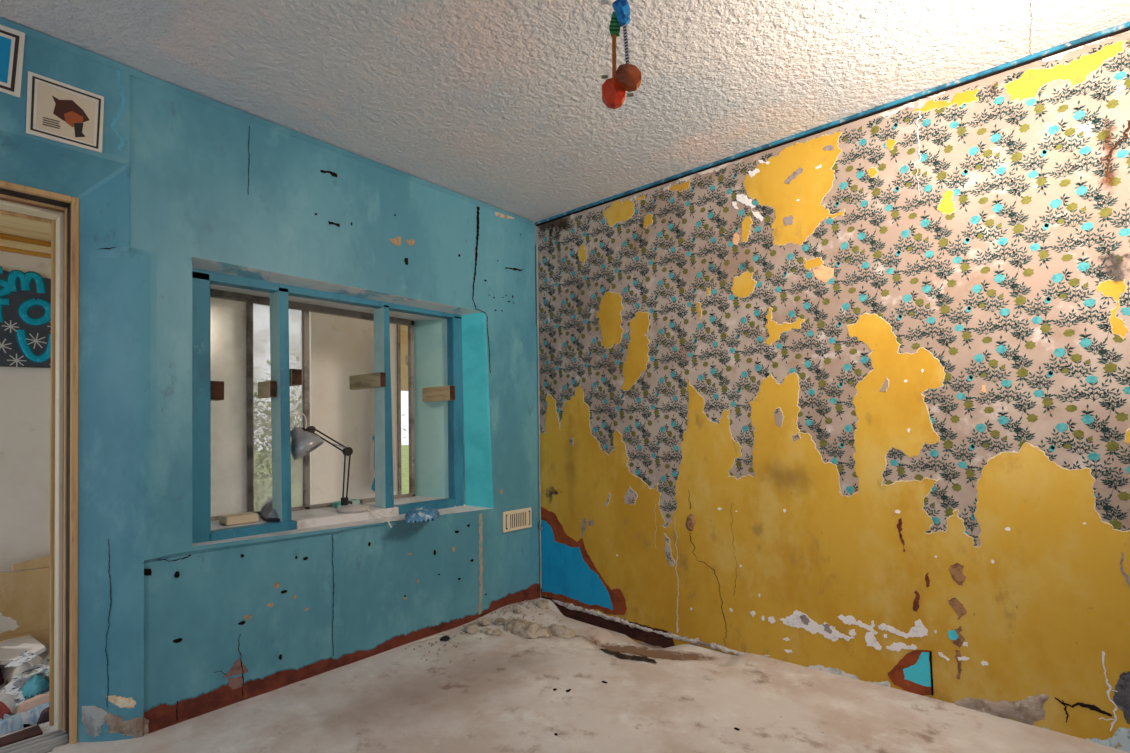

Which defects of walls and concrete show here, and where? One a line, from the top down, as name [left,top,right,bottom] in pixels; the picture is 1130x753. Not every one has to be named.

peeling [875,88,979,119]
peeling [1001,30,1130,102]
crack [1106,120,1130,172]
peeling [603,193,653,229]
peeling [663,131,845,270]
crack [472,206,491,373]
peeling [596,291,650,391]
peeling [731,270,757,299]
peeling [1096,279,1129,340]
peeling [82,313,1130,753]
crack [104,539,112,703]
crack [1055,651,1118,731]